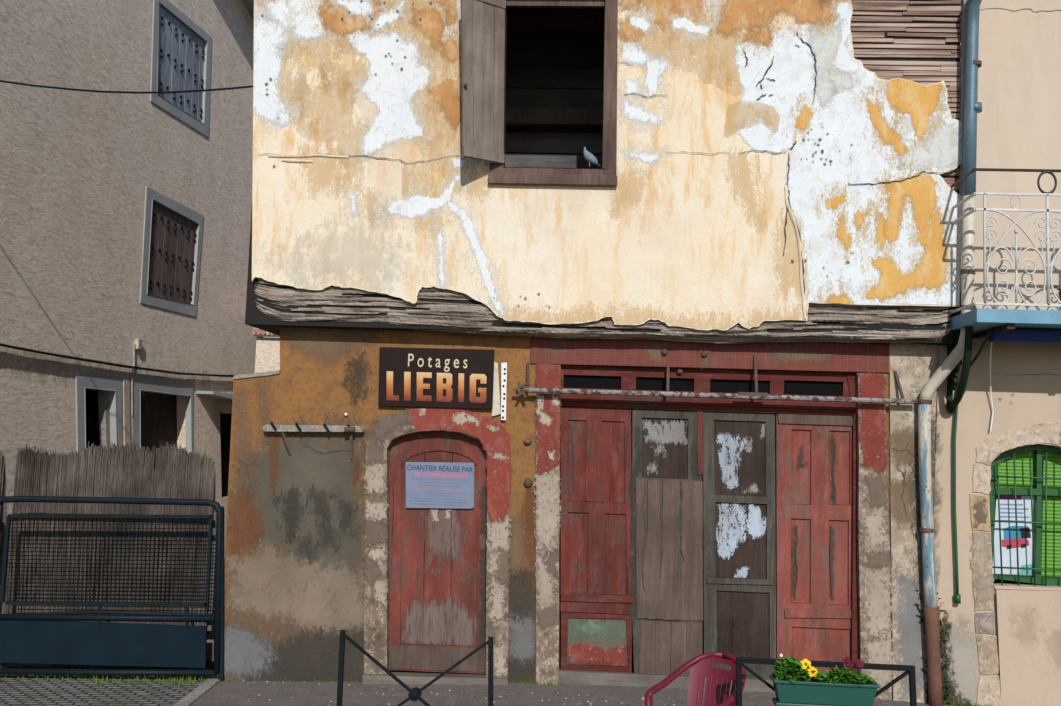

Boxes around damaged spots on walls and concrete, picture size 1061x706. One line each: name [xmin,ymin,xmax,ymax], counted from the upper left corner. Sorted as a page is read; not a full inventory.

crack [980,6,1061,14]
crack [303,153,460,163]
peeling [253,0,550,316]
crack [670,141,807,315]
peeling [617,0,963,306]
leakage [224,382,368,682]
leakage [280,327,376,404]
peeling [362,407,512,676]
peeling [533,363,563,611]
peeling [567,427,644,666]